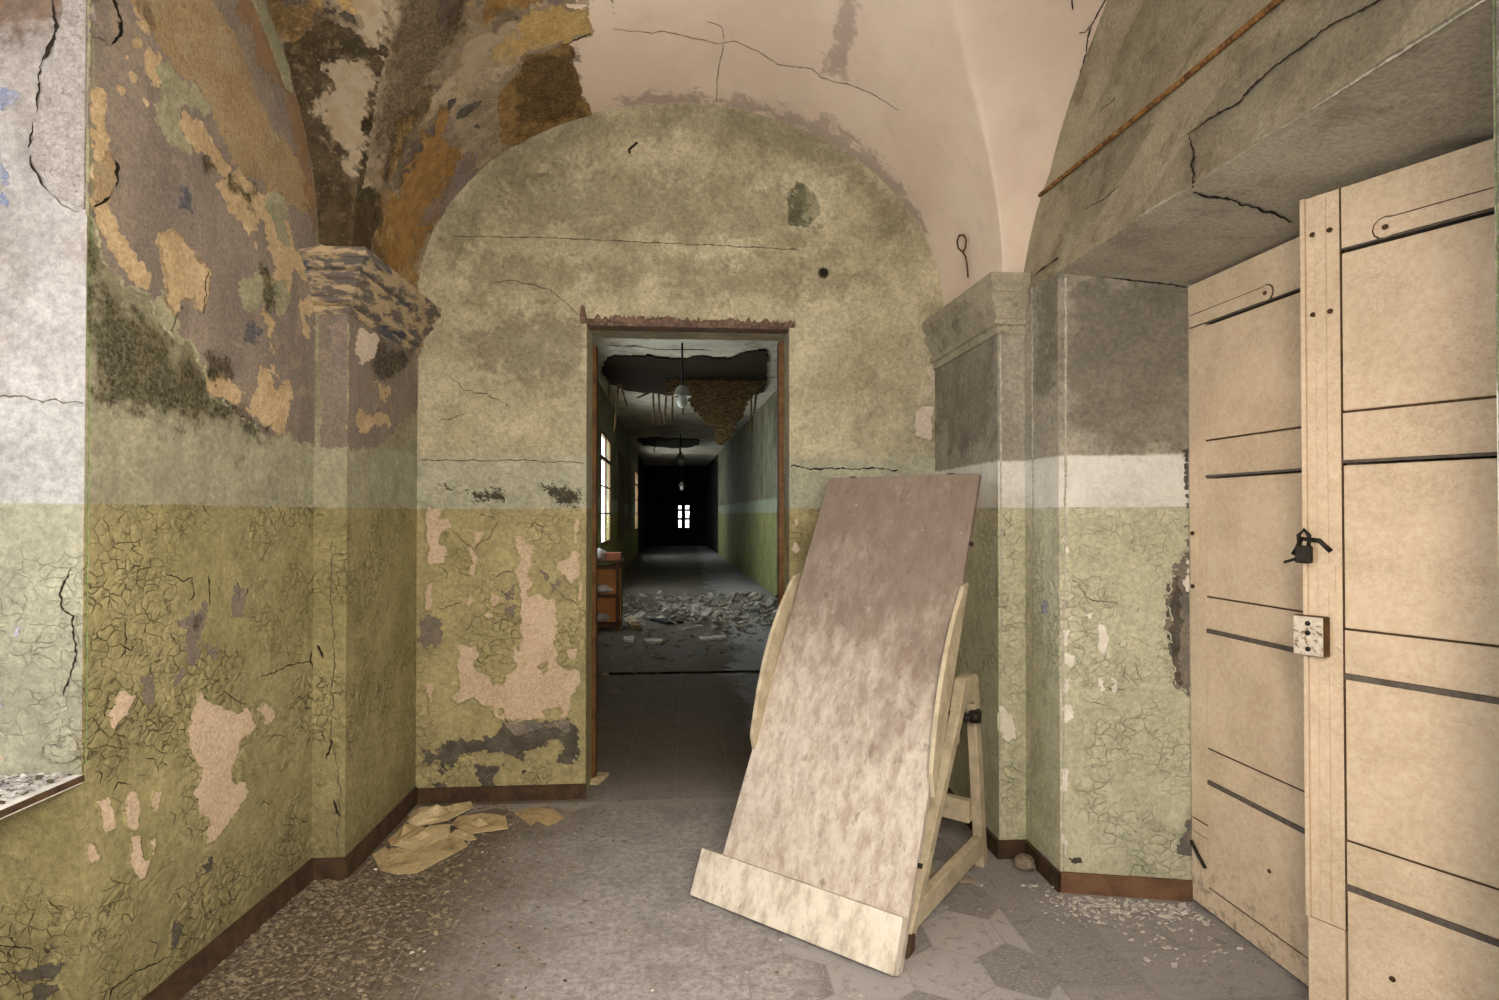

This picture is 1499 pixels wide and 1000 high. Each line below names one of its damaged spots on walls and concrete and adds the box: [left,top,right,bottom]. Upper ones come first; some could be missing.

crack [28,0,79,212]
crack [618,22,898,110]
crack [1182,0,1381,222]
peeling [85,0,419,453]
crack [59,567,77,694]
peeling [83,788,163,882]
peeling [105,674,155,729]
crack [166,574,249,606]
peeling [185,689,277,876]
crack [223,534,341,854]
peeling [417,505,585,788]
spalling [1163,448,1191,697]